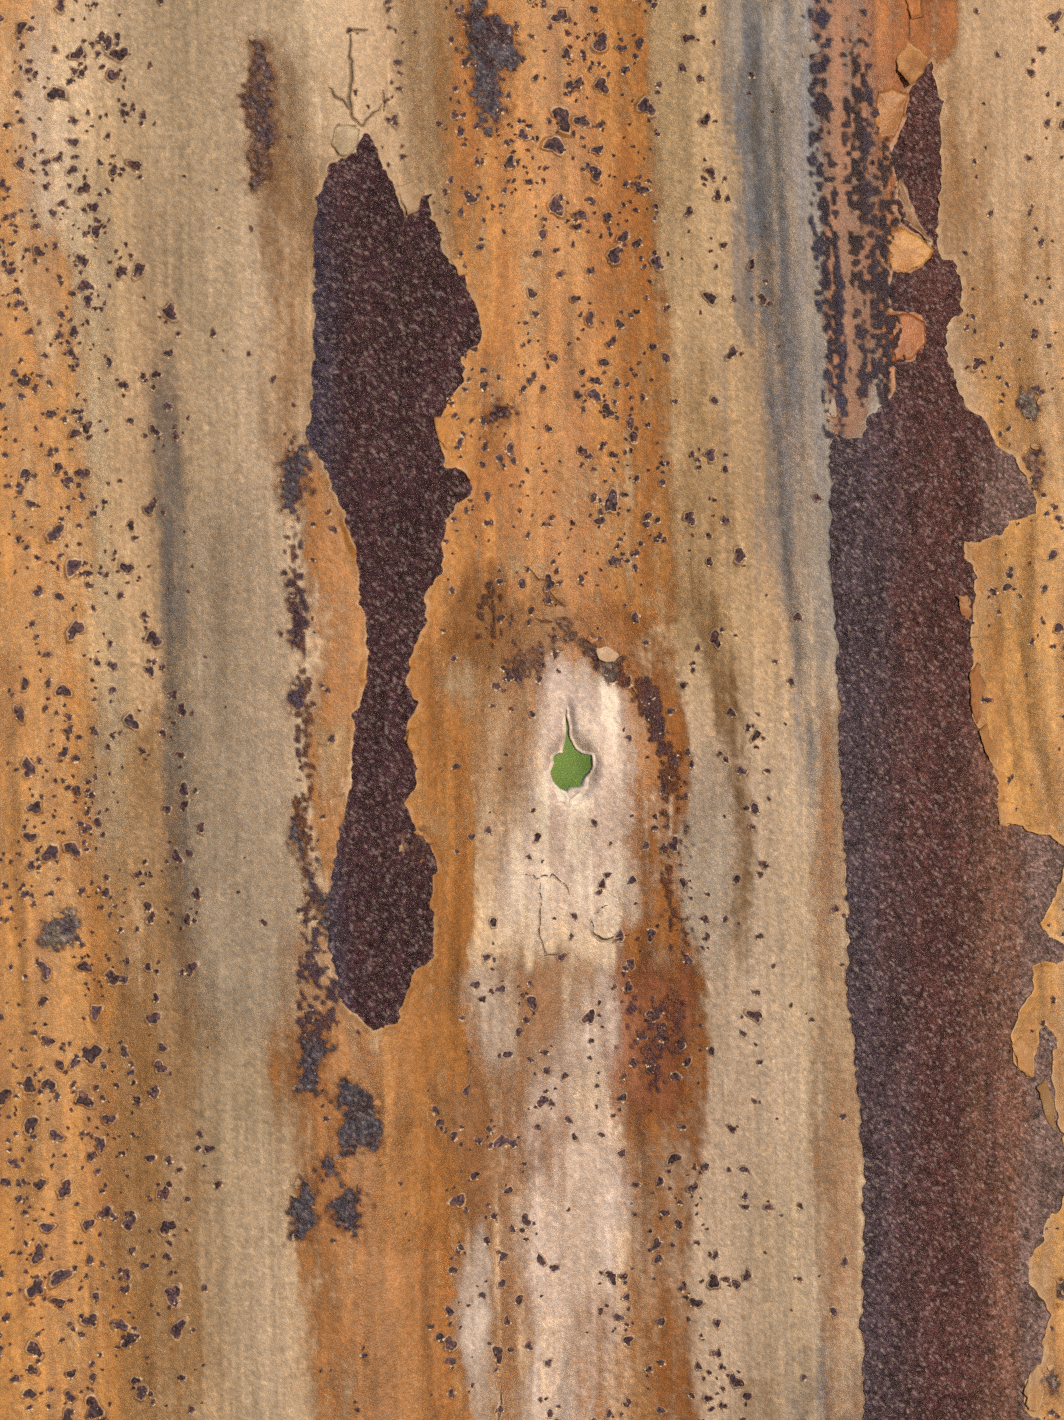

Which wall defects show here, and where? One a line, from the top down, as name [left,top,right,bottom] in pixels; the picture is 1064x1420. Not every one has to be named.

peeling [237,35,279,193]
crack [328,27,387,127]
peeling [455,0,522,140]
spalling [501,74,612,173]
corrosion [802,0,980,439]
corrosion [964,340,1064,457]
corrosion [1025,16,1064,79]
corrosion [0,0,207,1420]
peeling [278,124,488,1037]
corrosion [259,0,805,1420]
peeling [825,41,1064,1420]
corrosion [972,475,1064,838]